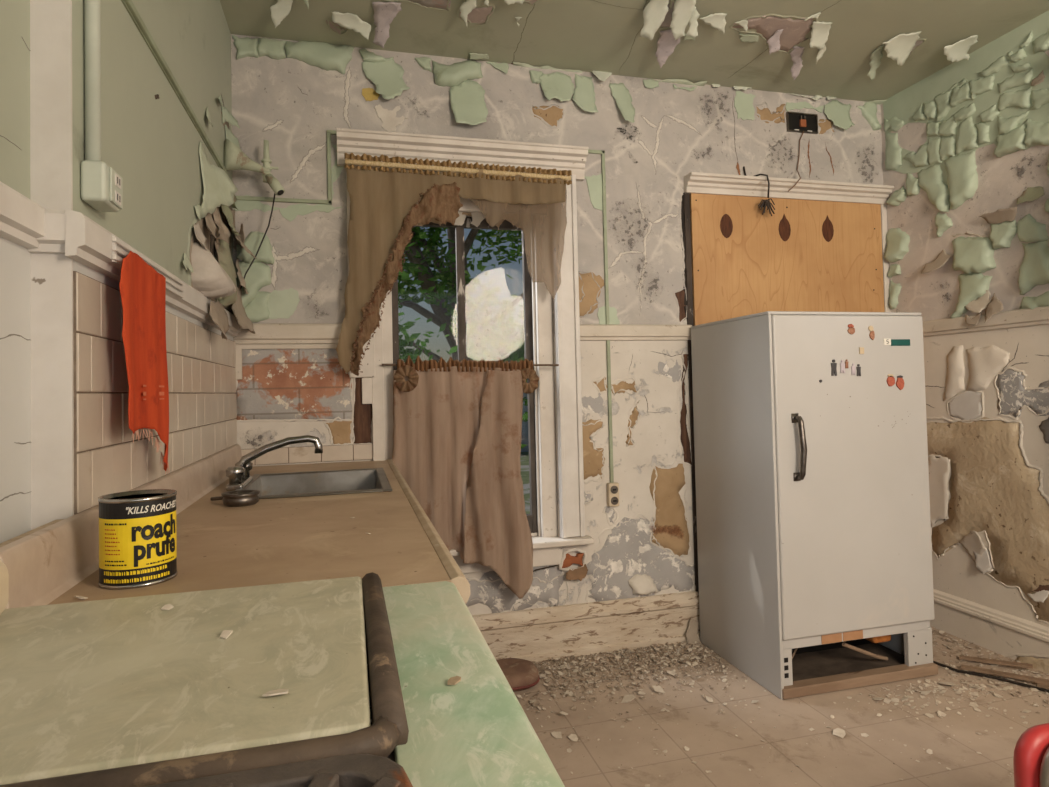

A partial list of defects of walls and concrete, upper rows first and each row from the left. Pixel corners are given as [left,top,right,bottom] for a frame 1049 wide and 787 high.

peeling [183,141,344,340]
peeling [232,0,540,100]
peeling [415,53,635,129]
flaking render [578,270,620,324]
peeling [640,0,1049,325]
flaking render [236,349,355,445]
peeling [466,352,695,613]
flaking render [926,366,1049,625]